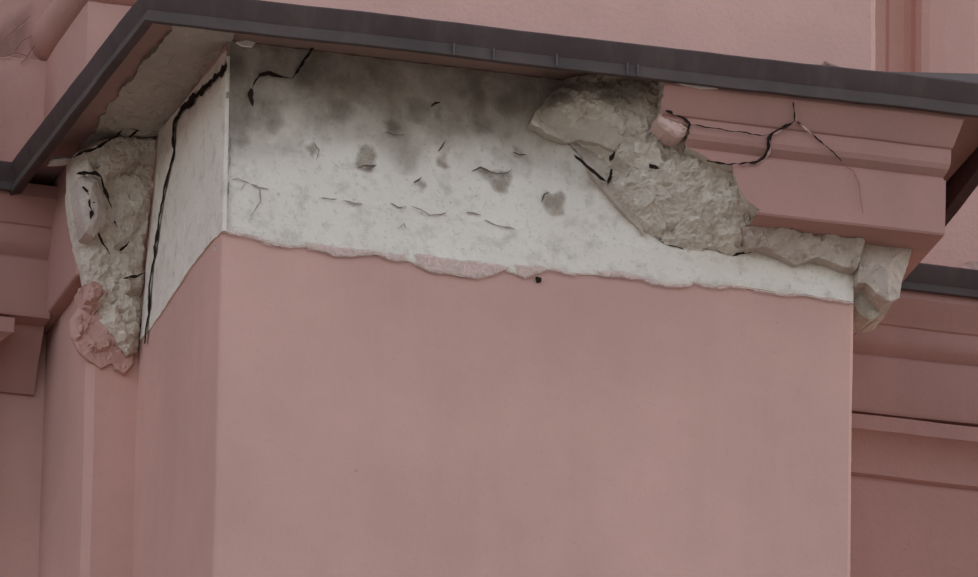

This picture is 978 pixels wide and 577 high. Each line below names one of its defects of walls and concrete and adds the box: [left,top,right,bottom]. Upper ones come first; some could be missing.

crack [73,61,227,376]
crack [248,47,314,107]
flaking render [48,26,943,356]
crack [666,102,863,212]